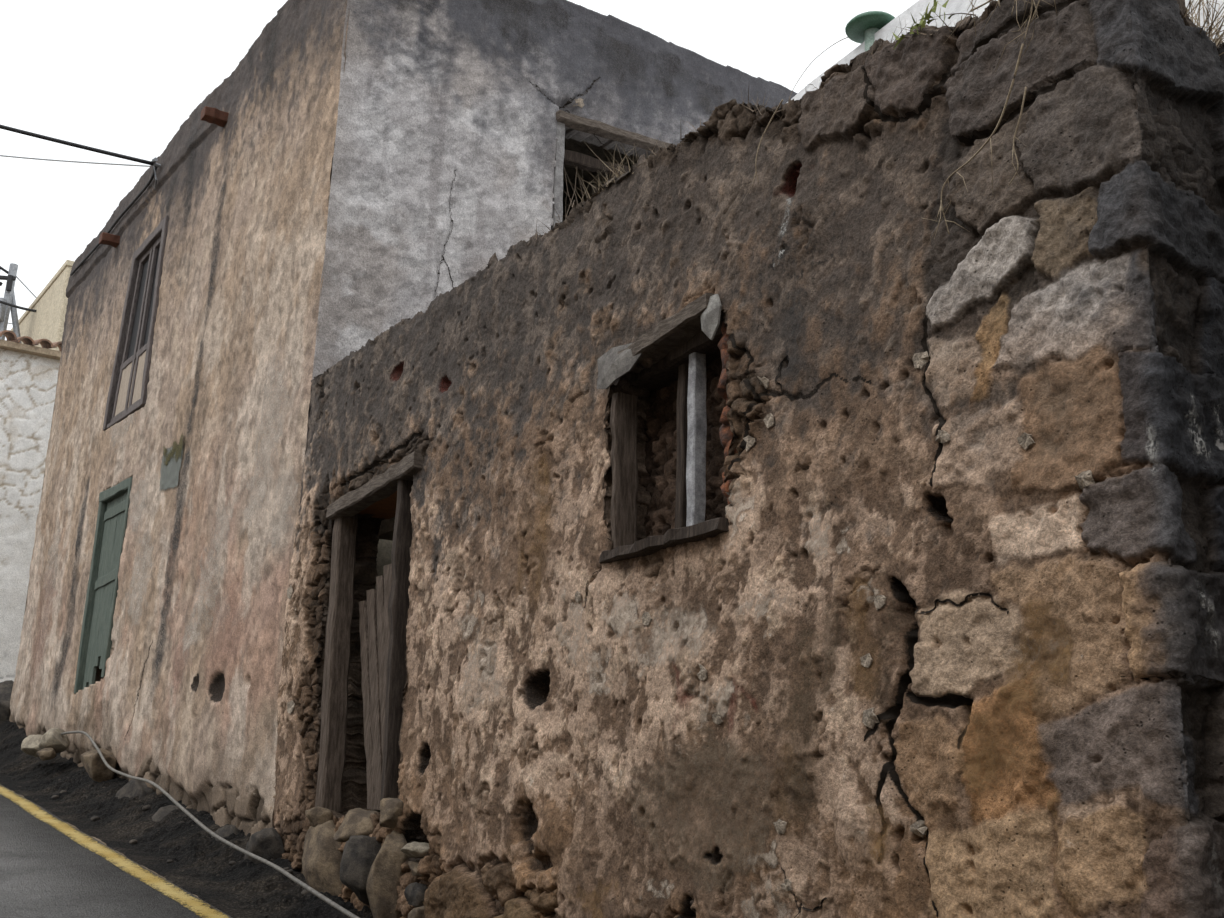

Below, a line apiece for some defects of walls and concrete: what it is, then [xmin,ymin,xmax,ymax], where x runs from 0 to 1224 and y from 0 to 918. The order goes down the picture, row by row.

damp [206,182,225,320]
crack [433,170,456,298]
crack [728,333,871,493]
crack [912,288,950,487]
damp [153,341,203,677]
peeling [725,483,754,545]
peeling [804,509,850,559]
peeling [602,590,735,720]
spalling [860,653,873,668]
crack [862,577,1009,917]
hole [523,806,553,871]
peeling [741,841,783,918]